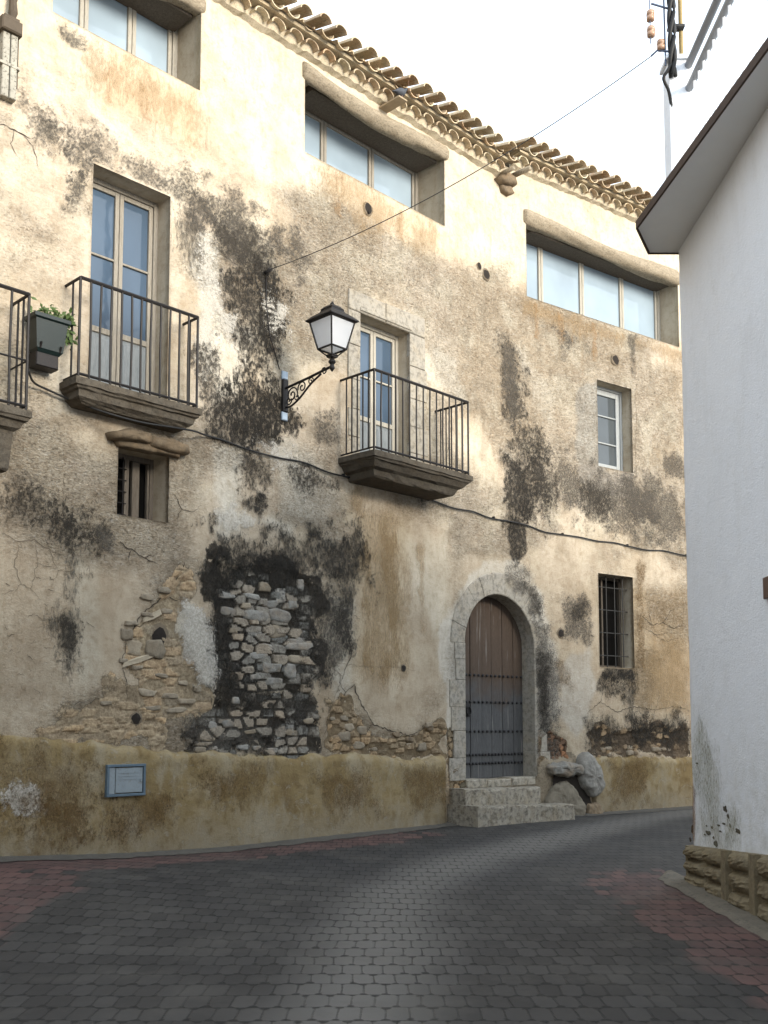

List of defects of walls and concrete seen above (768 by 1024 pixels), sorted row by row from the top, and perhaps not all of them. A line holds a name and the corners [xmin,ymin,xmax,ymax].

water stain [47,120,98,212]
crack [4,533,84,705]
water stain [1,473,115,671]
water stain [0,734,173,855]
flaking render [35,541,466,788]
water stain [172,190,380,808]
water stain [497,334,561,566]
water stain [577,480,661,523]
flaking render [587,720,698,764]
water stain [662,450,684,479]